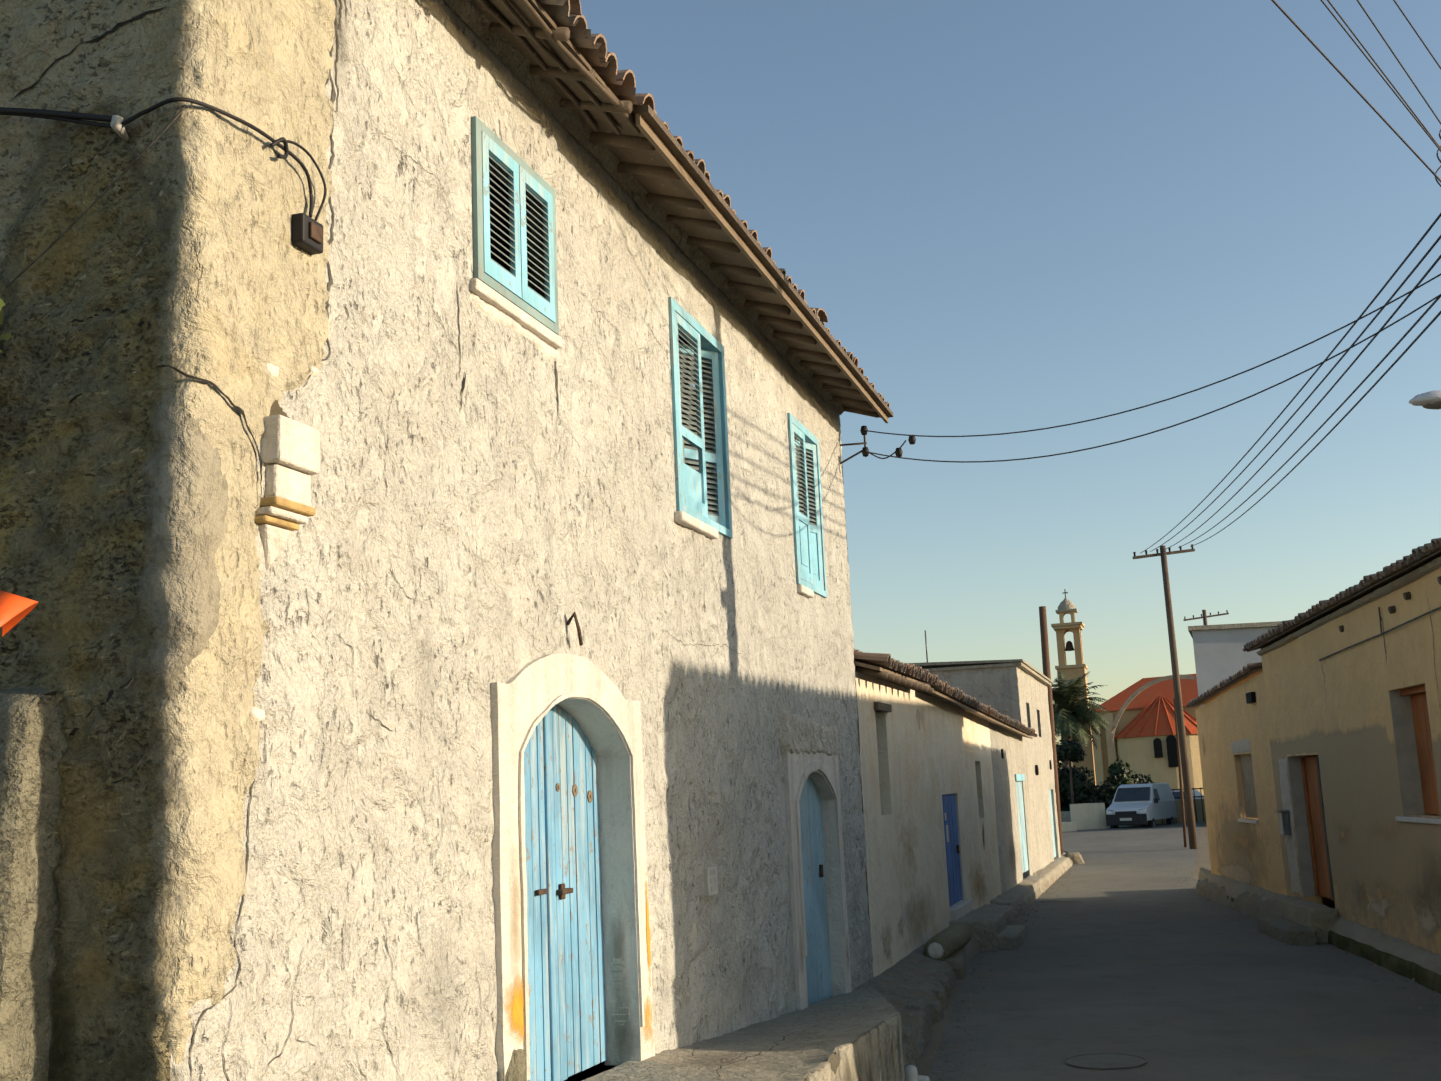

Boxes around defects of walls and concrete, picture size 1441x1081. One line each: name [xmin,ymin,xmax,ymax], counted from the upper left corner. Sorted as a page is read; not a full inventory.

crack [304,0,455,387]
crack [190,779,317,1081]
water stain [1270,727,1441,948]